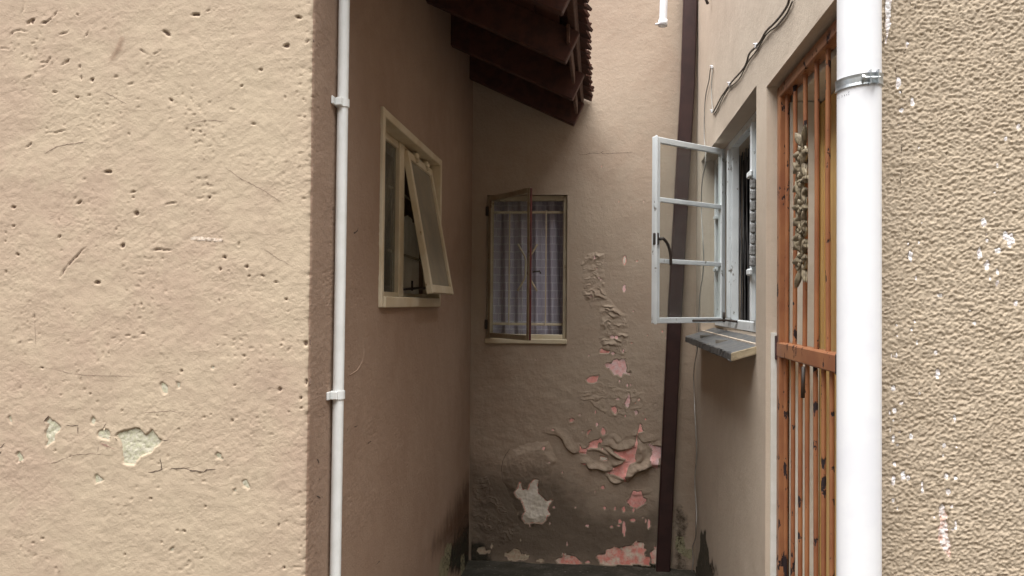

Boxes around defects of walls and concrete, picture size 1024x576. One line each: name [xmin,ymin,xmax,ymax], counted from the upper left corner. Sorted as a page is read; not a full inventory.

spalling [98,428,162,464]
crack [148,440,215,473]
peeling [556,335,661,566]
peeling [514,479,555,527]